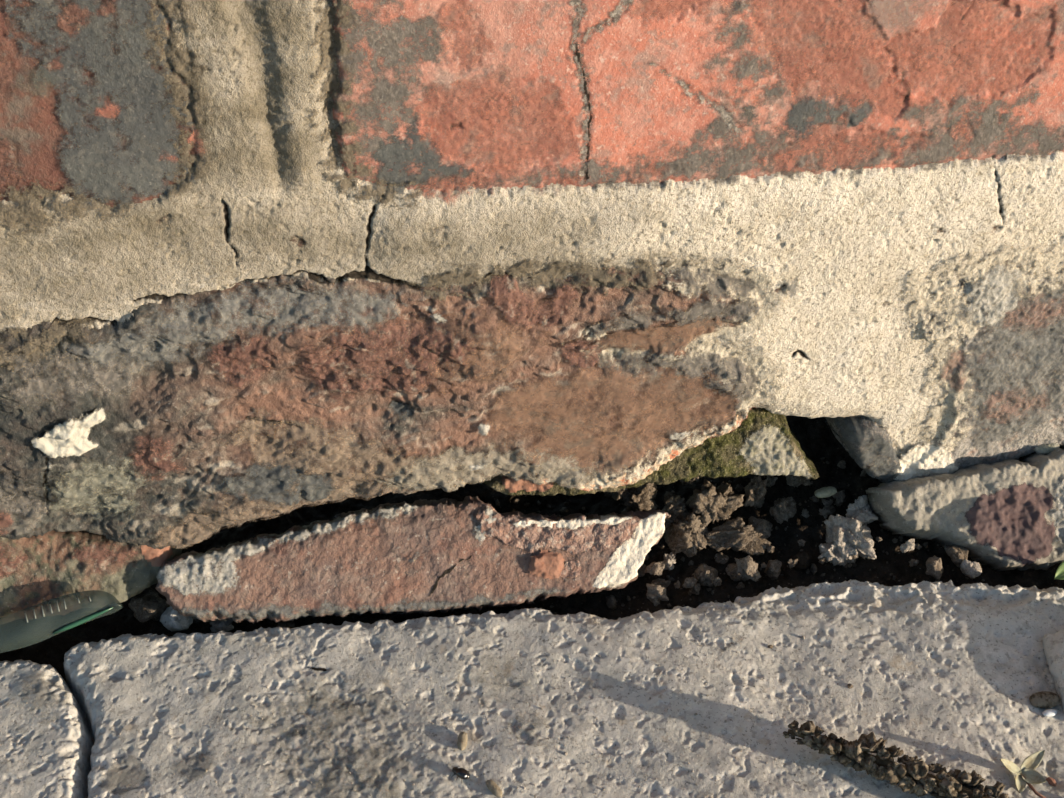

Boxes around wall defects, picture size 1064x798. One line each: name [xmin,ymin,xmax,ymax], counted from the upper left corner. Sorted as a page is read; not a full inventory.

crack [569,0,634,186]
crack [224,203,420,290]
crack [54,317,117,328]
crack [133,293,186,302]
spalling [295,307,482,421]
spalling [488,273,580,328]
peeling [31,408,106,458]
spalling [501,405,755,493]